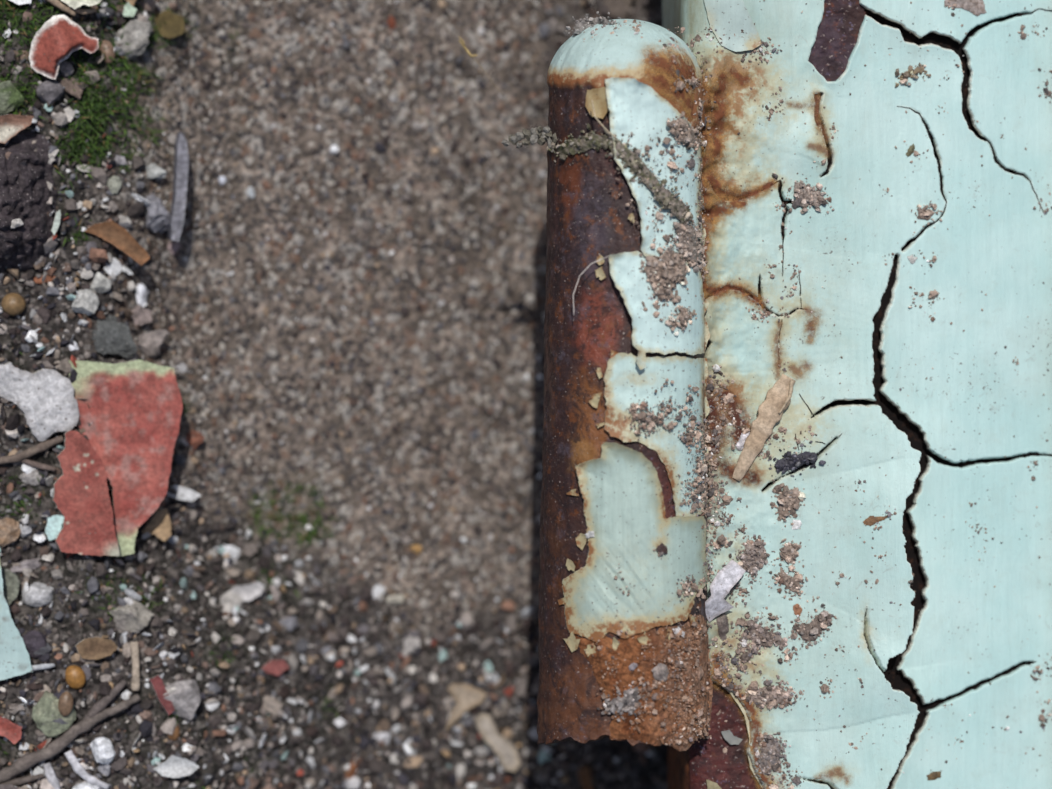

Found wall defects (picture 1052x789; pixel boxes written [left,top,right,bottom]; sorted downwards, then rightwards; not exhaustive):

rust [644,48,775,310]
rust [788,92,828,156]
peeling [814,93,822,125]
peeling [808,0,865,81]
crack [864,8,1052,212]
crack [705,180,805,356]
peeling [558,77,710,657]
rust [704,378,761,485]
crack [762,106,1052,789]
rust [569,615,772,789]
peeling [716,612,729,641]